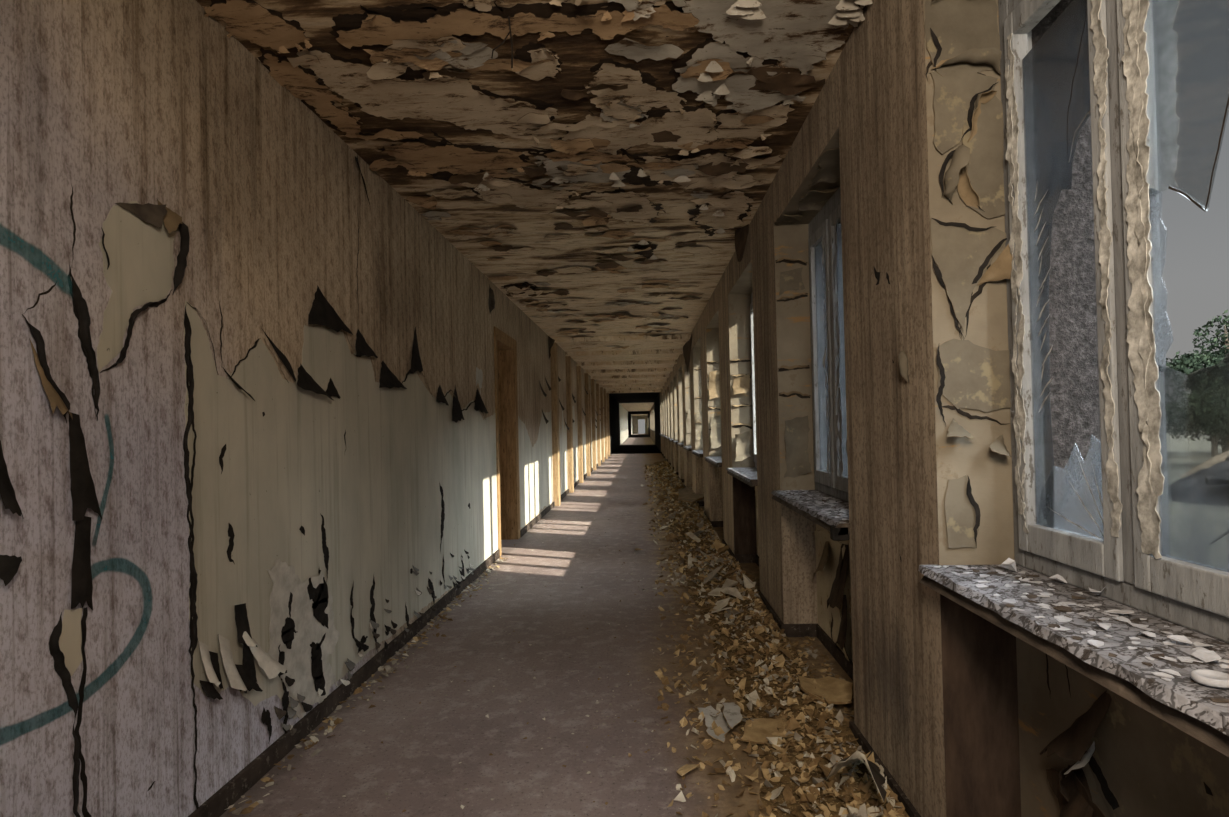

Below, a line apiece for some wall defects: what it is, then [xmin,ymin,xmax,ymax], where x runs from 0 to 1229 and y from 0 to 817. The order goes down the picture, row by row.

peeling [488,271,702,349]
crack [959,264,991,340]
peeling [924,0,1029,534]
flaking render [59,608,83,676]
spalling [198,550,475,744]
peeling [1039,689,1229,817]